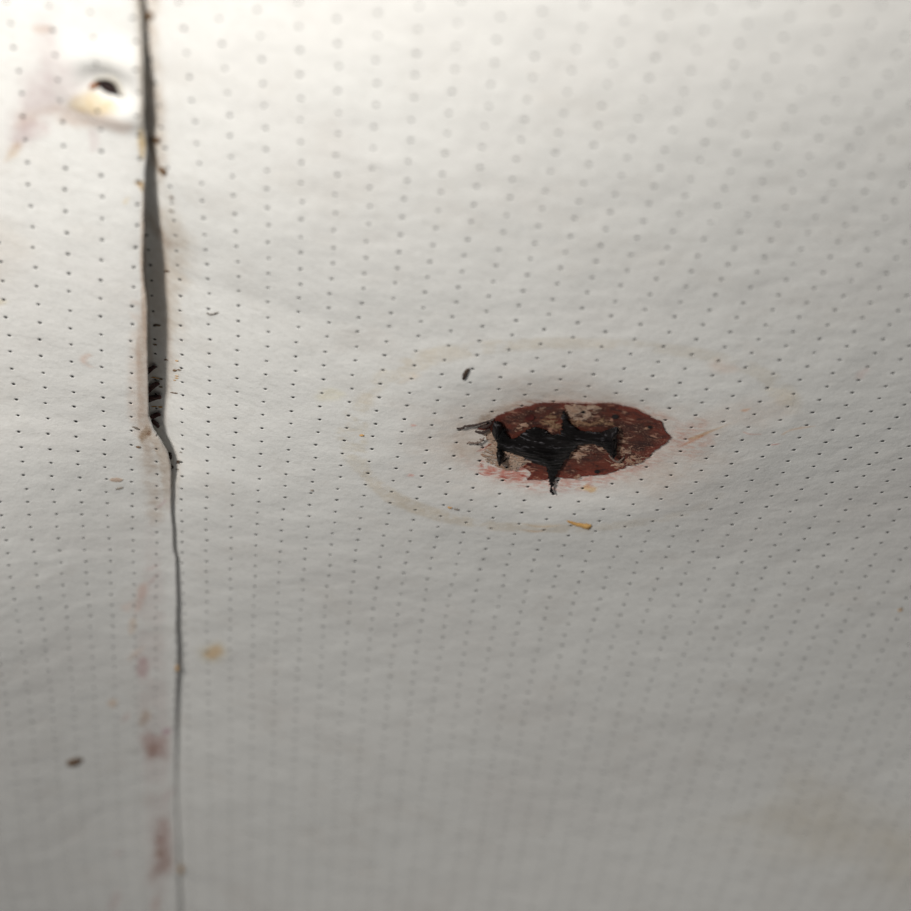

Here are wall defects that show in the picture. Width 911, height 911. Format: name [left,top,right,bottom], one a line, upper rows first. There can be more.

peeling [480,430,531,472]
peeling [515,404,655,469]